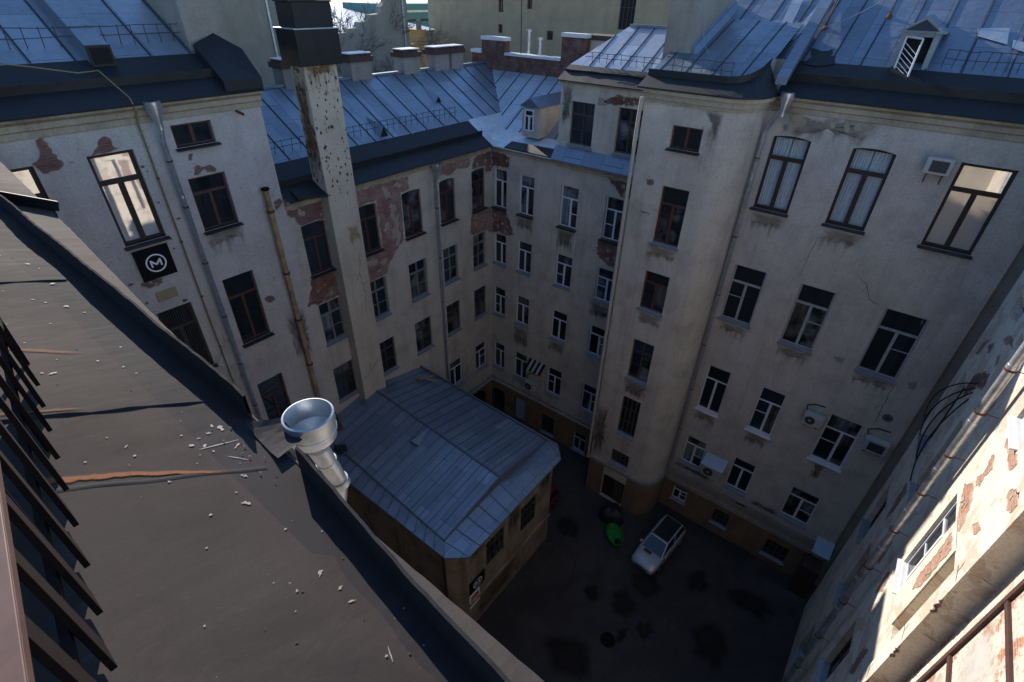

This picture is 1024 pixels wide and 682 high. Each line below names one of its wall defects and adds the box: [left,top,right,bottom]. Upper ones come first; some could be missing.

flaking render [32,138,64,174]
flaking render [91,136,119,156]
flaking render [273,66,409,282]
flaking render [439,151,510,176]
flaking render [470,206,514,236]
flaking render [596,241,621,268]
flaking render [912,438,1019,590]